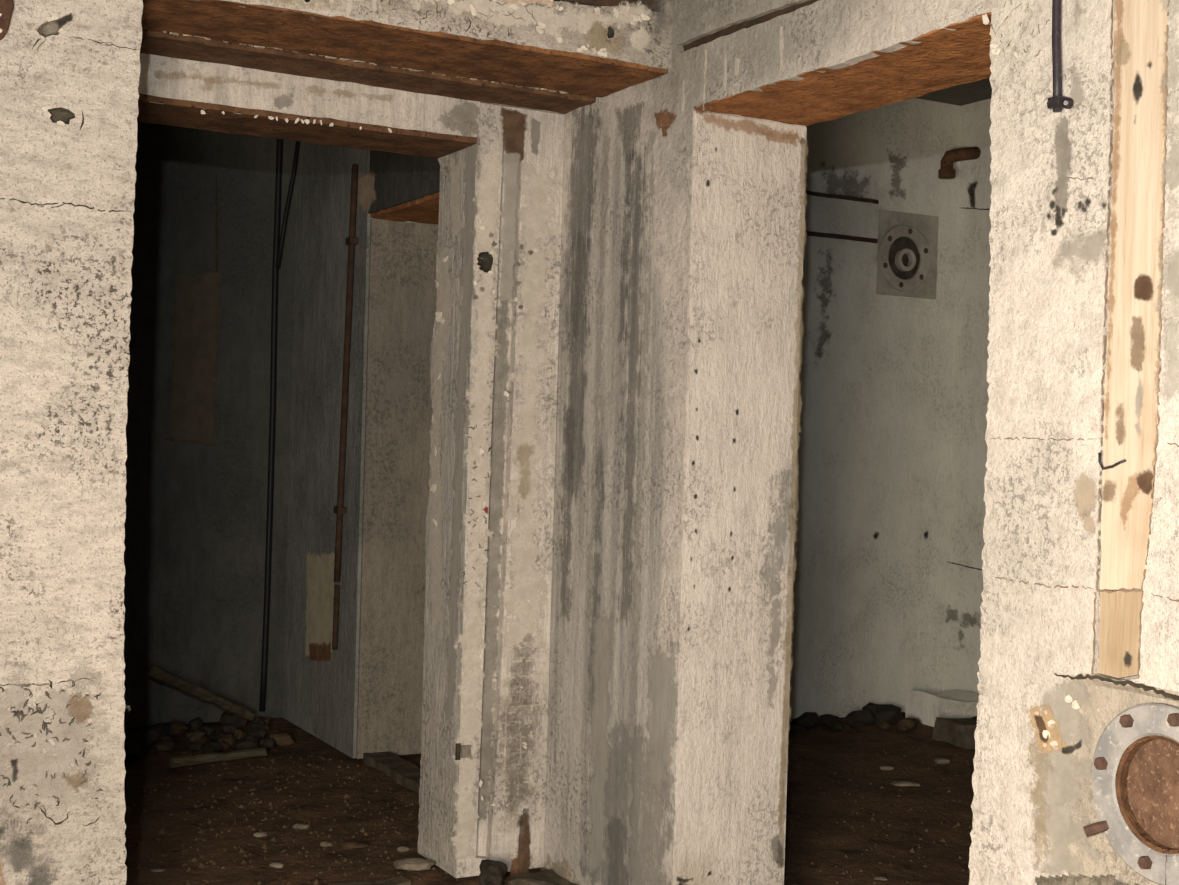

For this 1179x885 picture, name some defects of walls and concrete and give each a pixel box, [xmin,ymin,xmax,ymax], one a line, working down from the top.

peeling [400,0,652,57]
water stain [560,104,678,885]
corrosion [511,813,531,877]
corrosion [1115,735,1179,854]